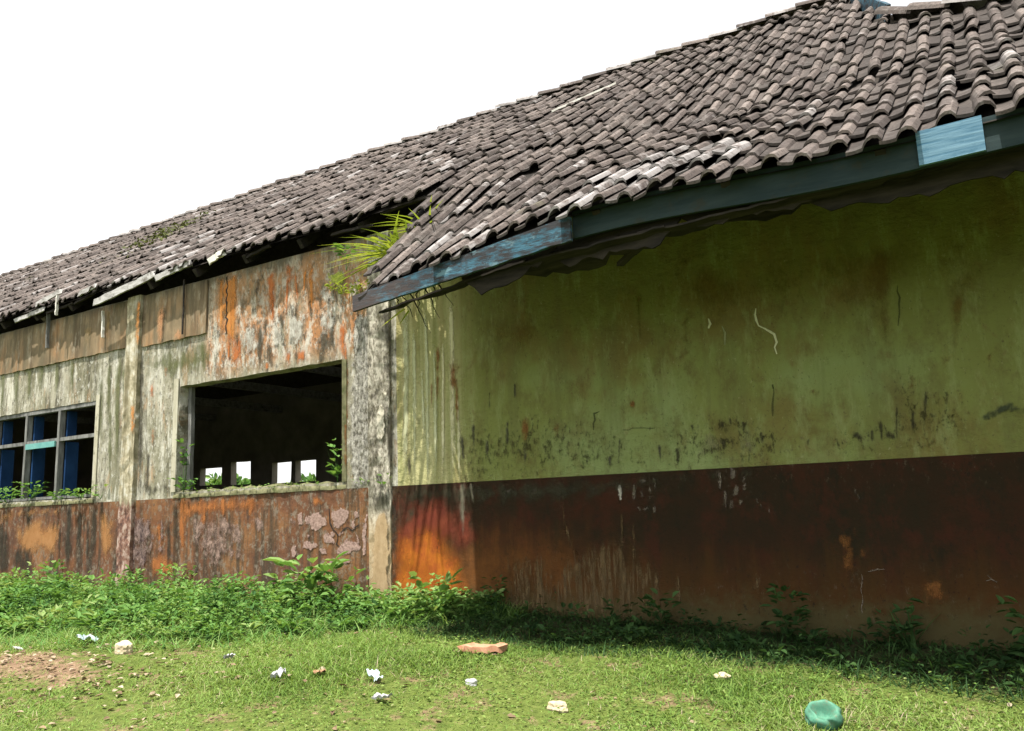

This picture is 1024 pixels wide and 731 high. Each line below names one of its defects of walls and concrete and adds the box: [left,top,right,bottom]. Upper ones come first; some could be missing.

water stain [14,363,74,396]
water stain [99,368,111,456]
rust [220,277,240,361]
rust [268,266,313,319]
rust [339,326,348,384]
water stain [348,315,368,488]
water stain [676,419,746,463]
water stain [837,392,950,450]
flaking render [290,507,390,599]
rust [396,527,458,603]